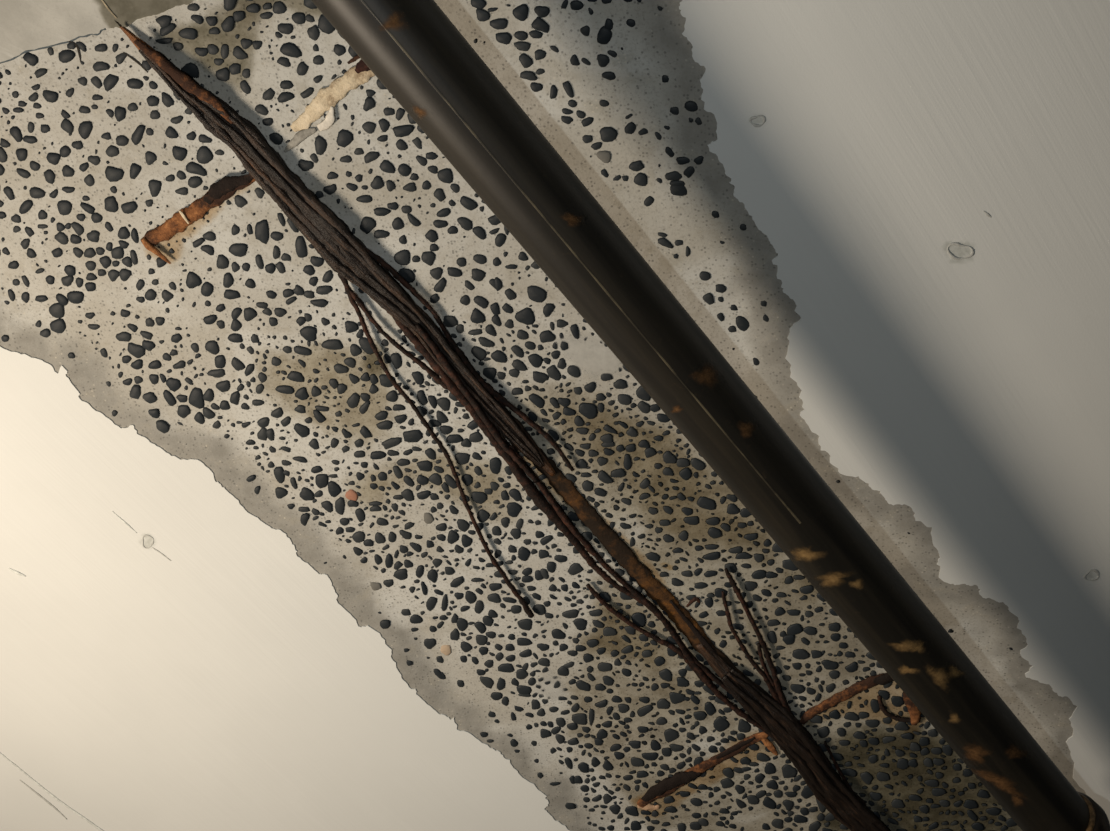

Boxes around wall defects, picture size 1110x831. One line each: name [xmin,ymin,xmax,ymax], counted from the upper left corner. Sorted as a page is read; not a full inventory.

corrosion [134,39,233,124]
corrosion [347,55,370,73]
corrosion [140,174,256,264]
spalling [0,0,887,831]
spalling [434,0,1086,794]
corrosion [533,447,746,676]
corrosion [797,550,815,559]
corrosion [825,574,860,587]
corrosion [800,667,921,726]
corrosion [637,732,778,811]
spalling [803,681,1022,831]